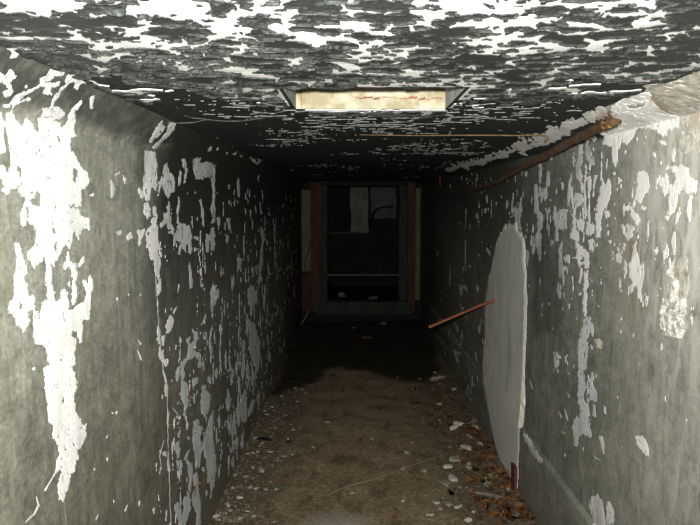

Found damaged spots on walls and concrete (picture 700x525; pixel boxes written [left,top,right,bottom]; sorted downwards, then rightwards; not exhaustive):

peeling [0,69,17,97]
peeling [199,104,295,124]
peeling [388,139,474,156]
peeling [506,164,551,268]
peeling [607,171,650,307]
flaking render [654,231,690,298]
peeling [545,136,612,450]
peeling [116,120,279,525]
peeling [523,433,543,463]
peeling [635,436,649,456]
peeling [589,494,614,525]